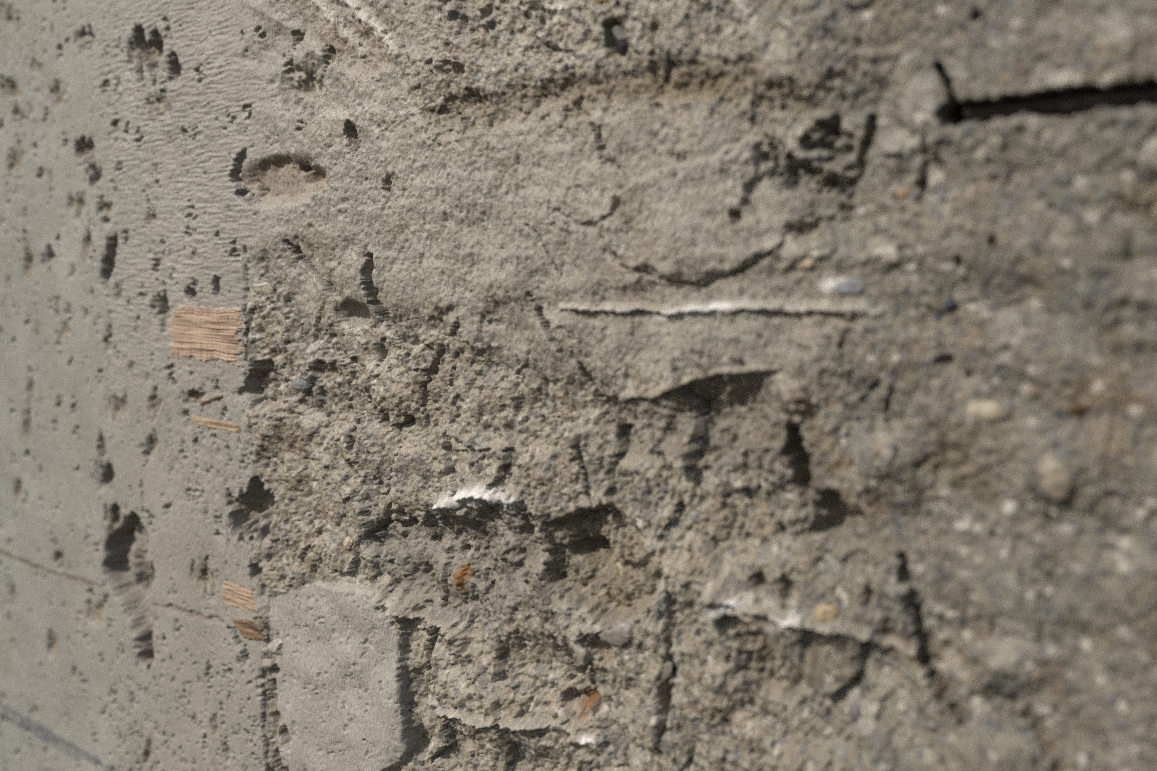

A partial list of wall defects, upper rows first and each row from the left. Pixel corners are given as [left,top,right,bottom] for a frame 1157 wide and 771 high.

spalling [267,28,338,127]
spalling [230,147,327,210]
spalling [343,116,362,163]
spalling [420,0,880,271]
spalling [332,296,373,331]
spalling [236,357,287,418]
spalling [593,379,869,553]
spalling [910,419,1013,512]
spalling [223,473,275,584]
spalling [372,486,673,750]
spalling [746,569,803,613]
spalling [724,617,823,722]